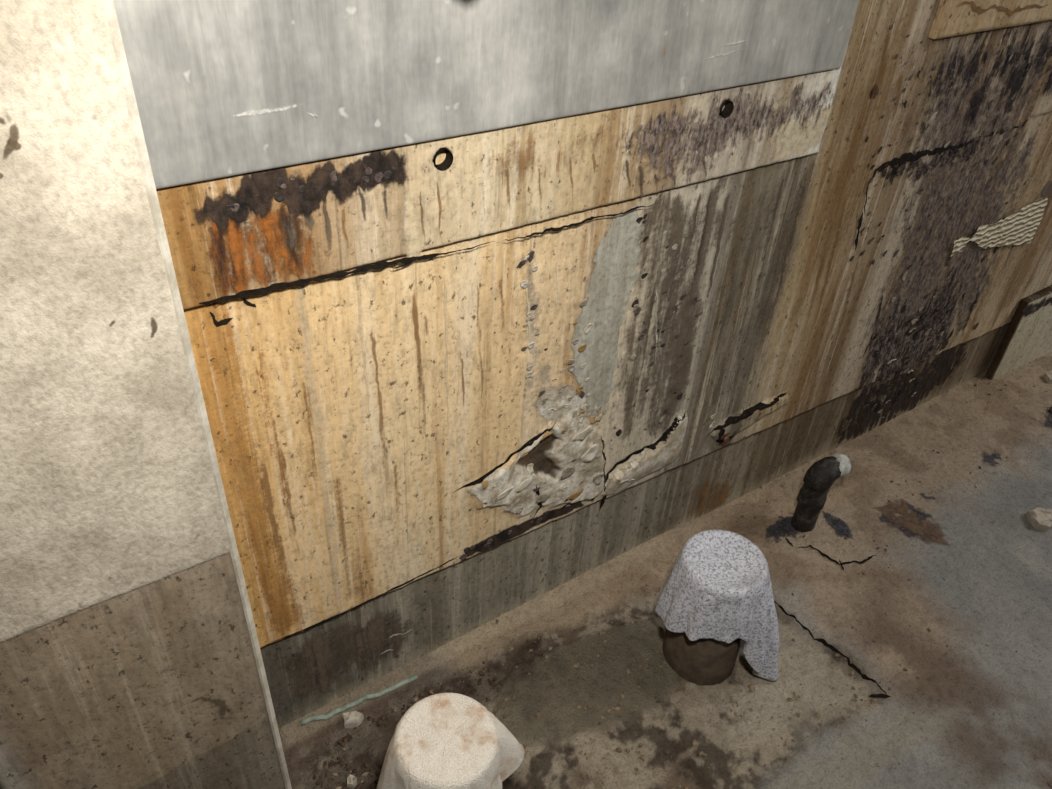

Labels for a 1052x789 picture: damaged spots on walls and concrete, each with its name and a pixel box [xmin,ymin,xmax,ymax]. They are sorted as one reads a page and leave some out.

corrosion [209,204,314,296]
crack [199,202,656,326]
water stain [616,81,832,438]
water stain [809,23,1052,448]
peeling [951,196,1048,257]
spalling [453,205,645,516]
crack [706,391,789,445]
crack [774,601,891,698]